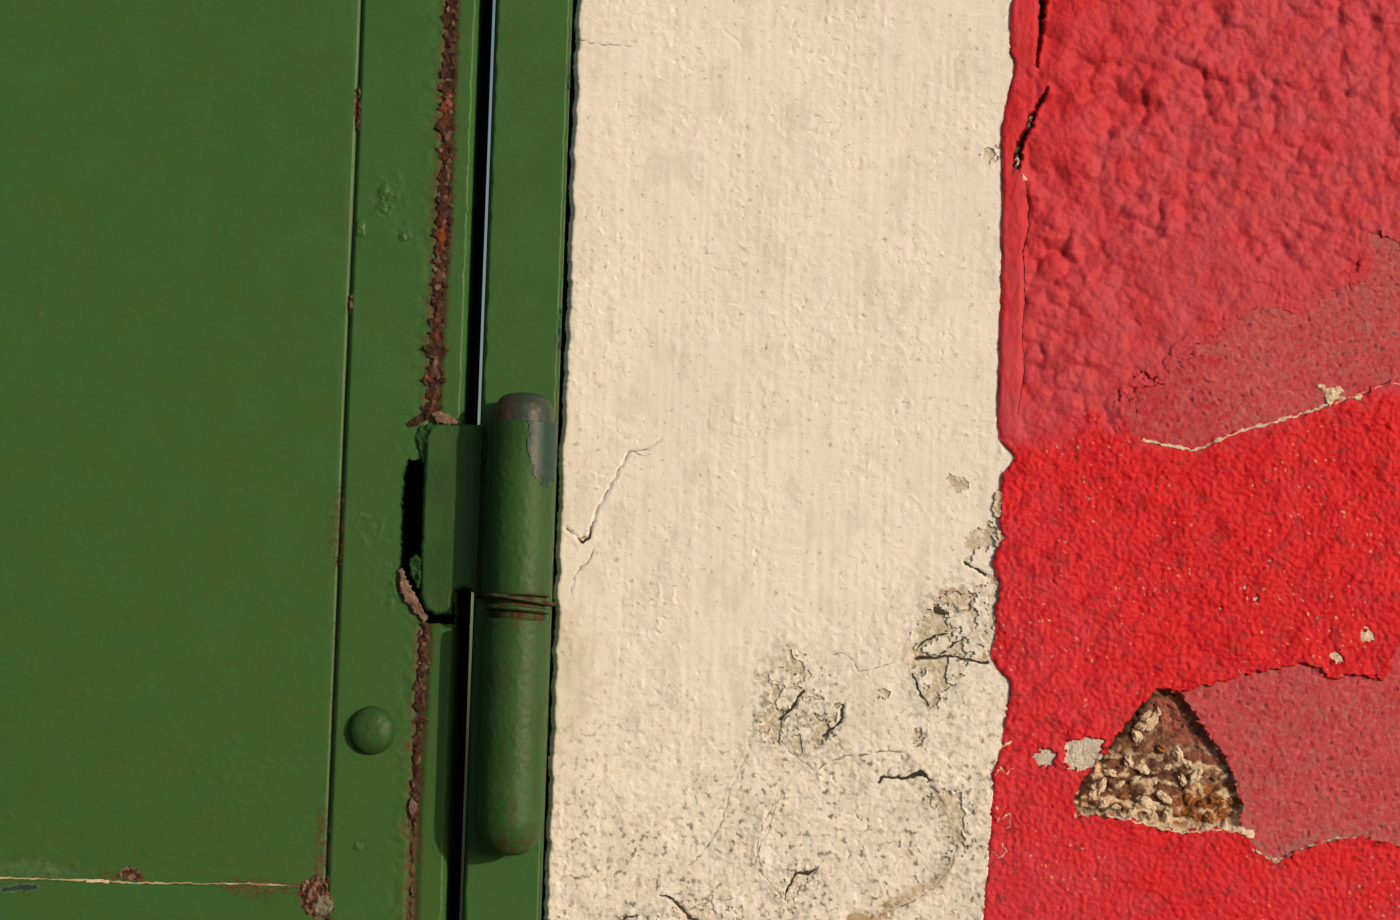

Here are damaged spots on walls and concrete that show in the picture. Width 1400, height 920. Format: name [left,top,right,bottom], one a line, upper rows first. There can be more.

corrosion [419,0,463,414]
crack [1013,0,1048,414]
peeling [1123,231,1400,451]
corrosion [397,568,431,920]
crack [566,449,651,592]
spalling [753,650,845,755]
spalling [912,728,923,746]
spalling [909,490,1005,709]
peeling [1073,644,1400,864]
peeling [1361,626,1375,642]
peeling [0,877,300,894]
corrosion [220,817,334,920]